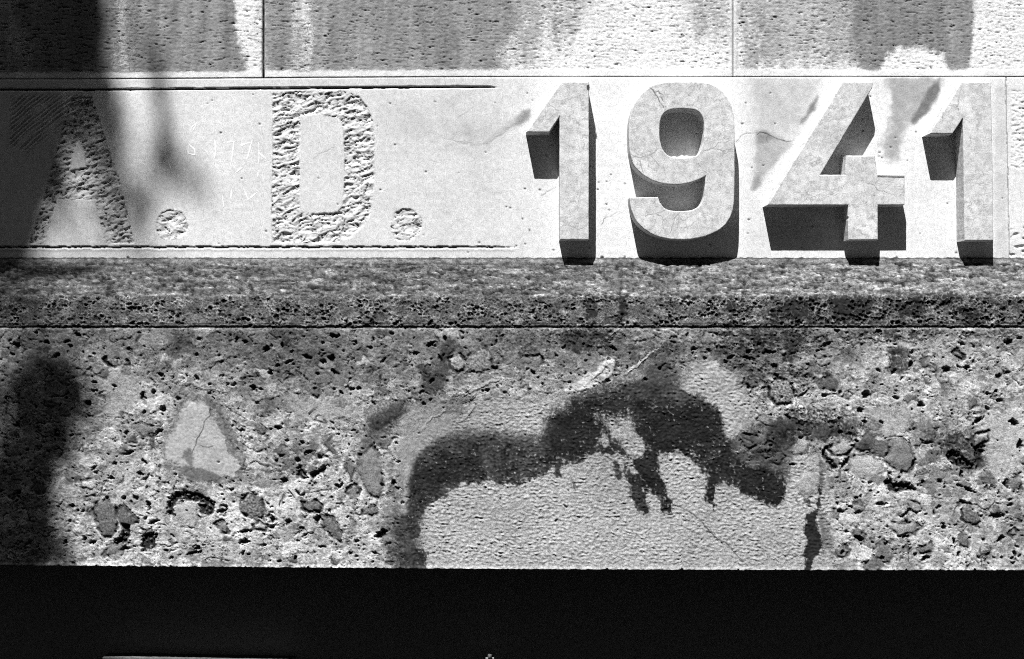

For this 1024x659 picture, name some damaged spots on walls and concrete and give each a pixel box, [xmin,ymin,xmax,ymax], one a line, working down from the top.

damp [388,348,796,568]
damp [797,460,832,570]